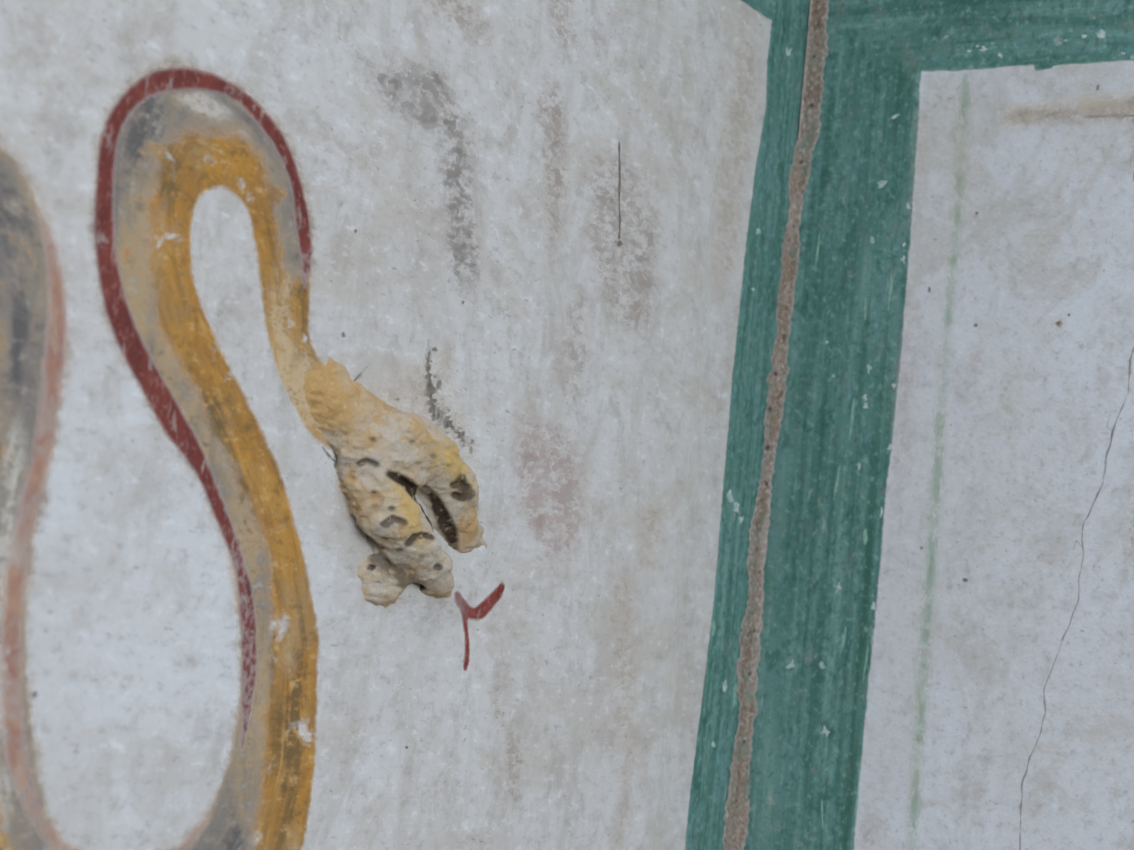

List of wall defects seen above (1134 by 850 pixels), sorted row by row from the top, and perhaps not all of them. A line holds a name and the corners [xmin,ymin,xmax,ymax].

crack [1019,347,1134,850]